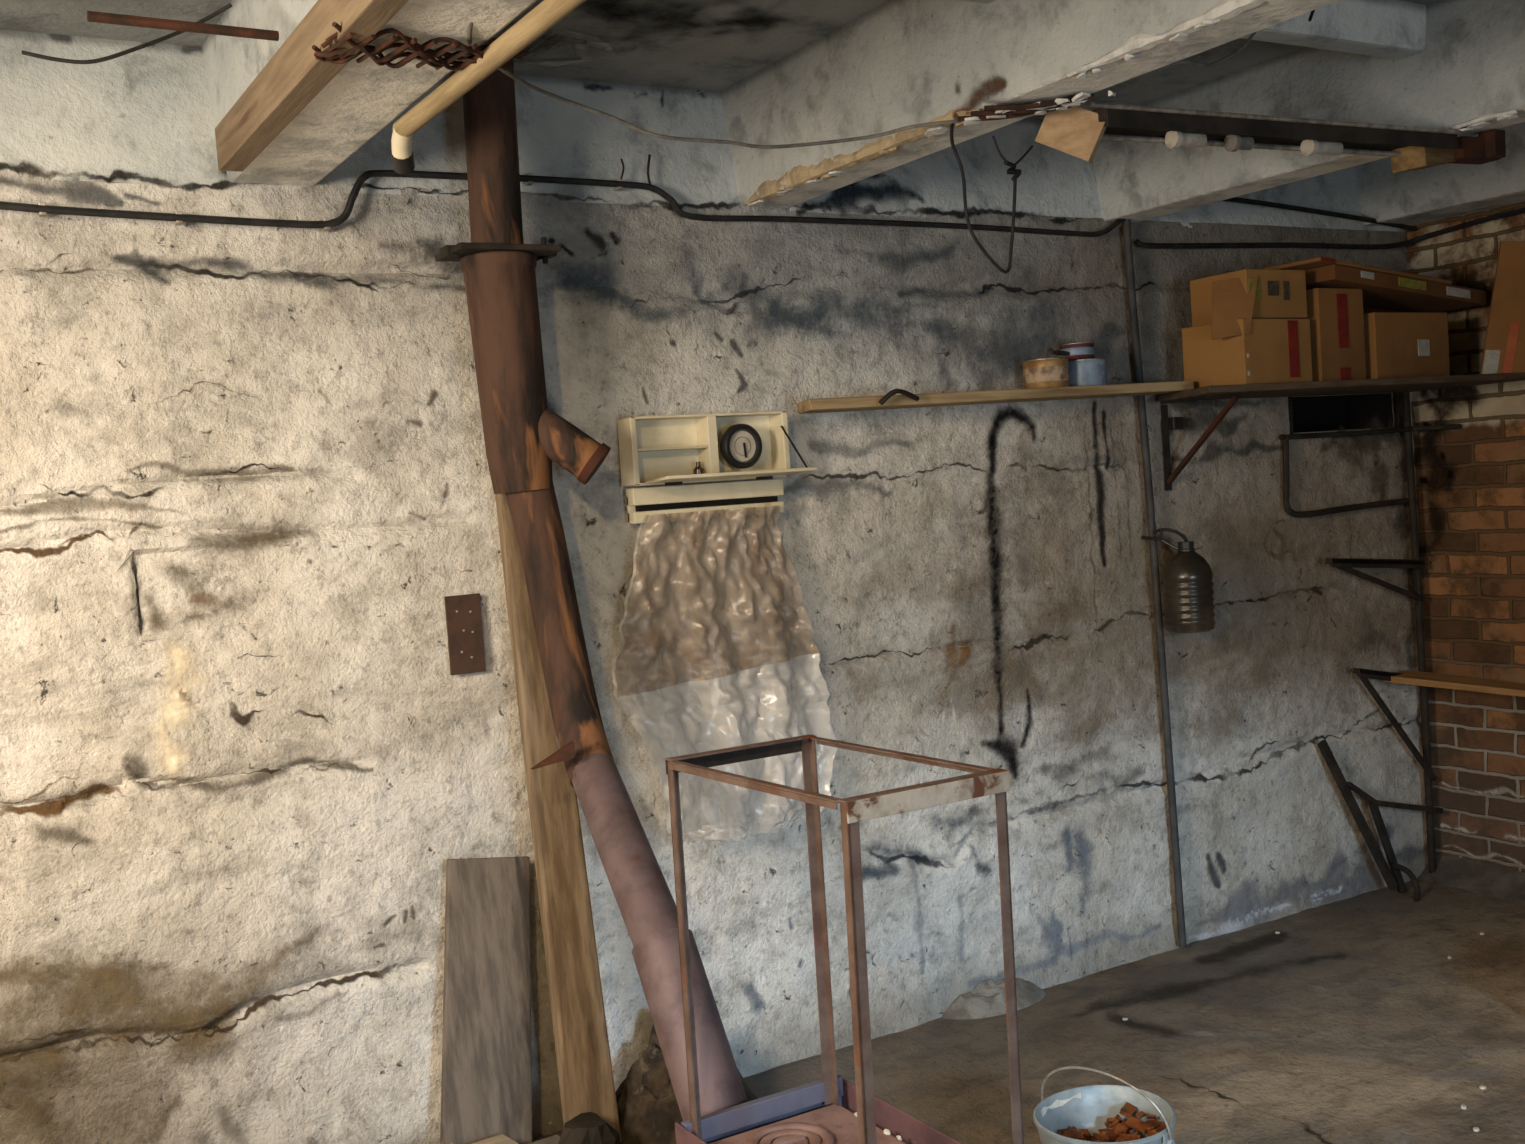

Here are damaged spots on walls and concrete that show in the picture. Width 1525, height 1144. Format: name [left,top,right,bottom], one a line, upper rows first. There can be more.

spalling [1451,110,1518,132]
crack [795,203,1081,224]
water stain [877,248,952,271]
crack [147,263,442,291]
water stain [1431,373,1478,410]
water stain [989,407,1035,449]
crack [225,463,278,474]
crack [809,462,1068,480]
crack [1029,712,1410,814]
crack [0,777,162,816]
crack [870,851,943,867]
crack [1,966,390,1062]